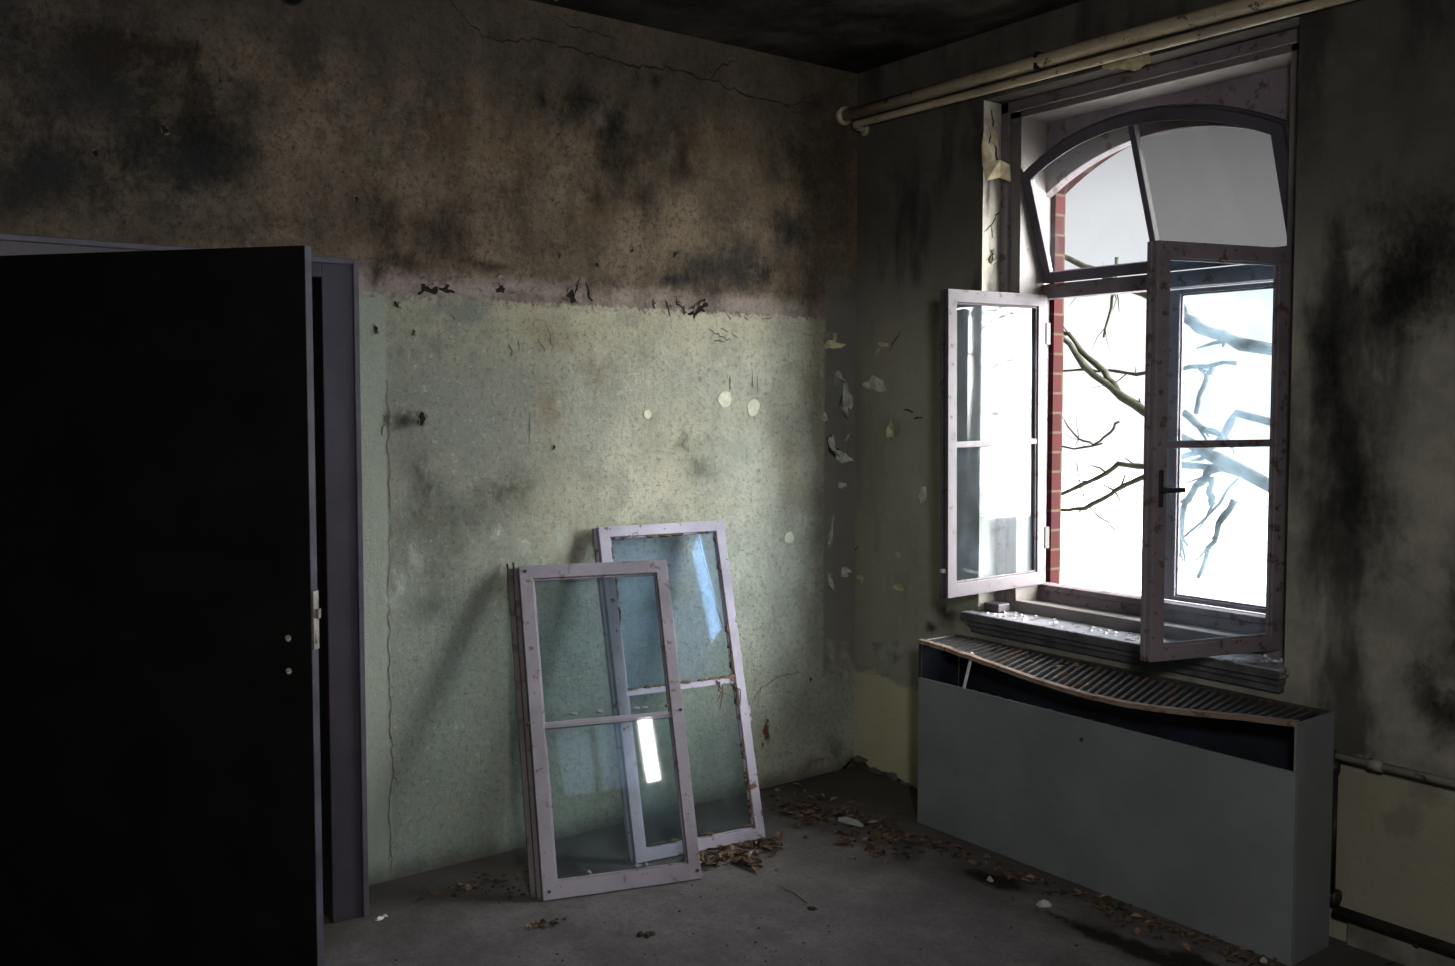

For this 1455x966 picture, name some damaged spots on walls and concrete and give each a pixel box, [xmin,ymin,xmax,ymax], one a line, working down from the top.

leakage [0,8,216,190]
flaking render [566,286,579,305]
crack [381,380,398,874]